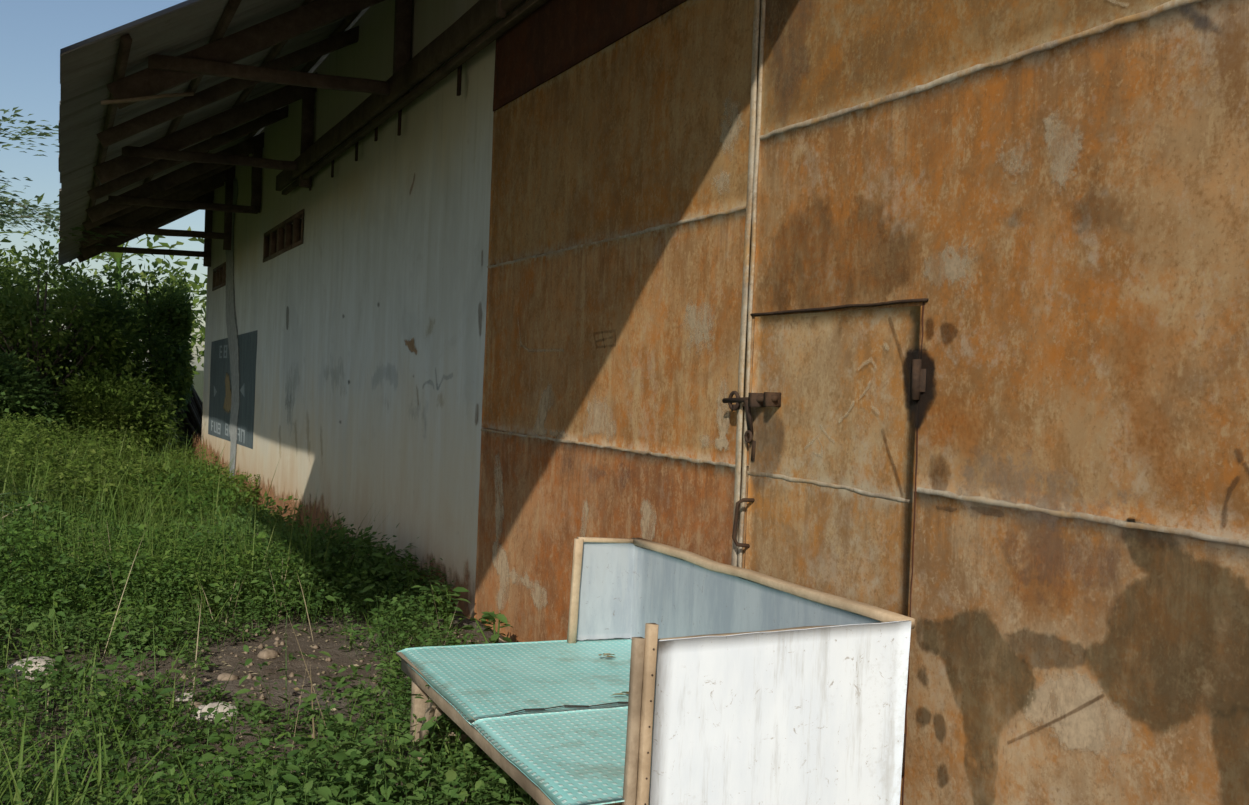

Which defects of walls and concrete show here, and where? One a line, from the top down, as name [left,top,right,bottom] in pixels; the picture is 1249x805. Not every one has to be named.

rust [903,349,936,429]